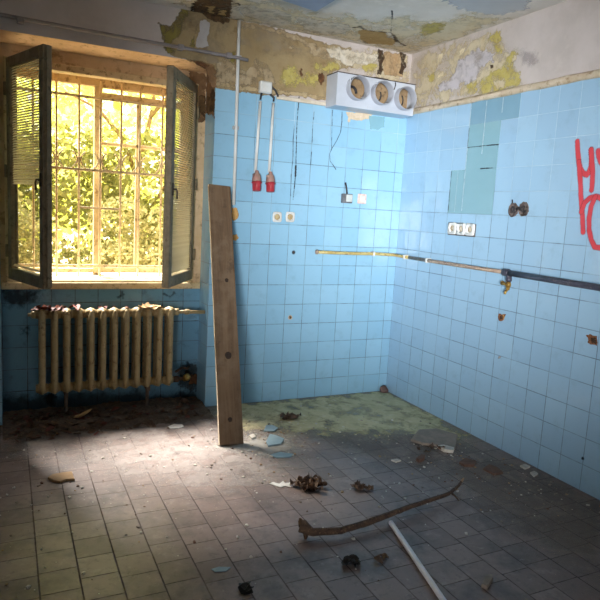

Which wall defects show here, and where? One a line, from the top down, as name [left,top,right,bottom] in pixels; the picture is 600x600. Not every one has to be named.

flaking render [353,26,406,46]
peeling [158,0,353,123]
leakage [242,391,471,439]